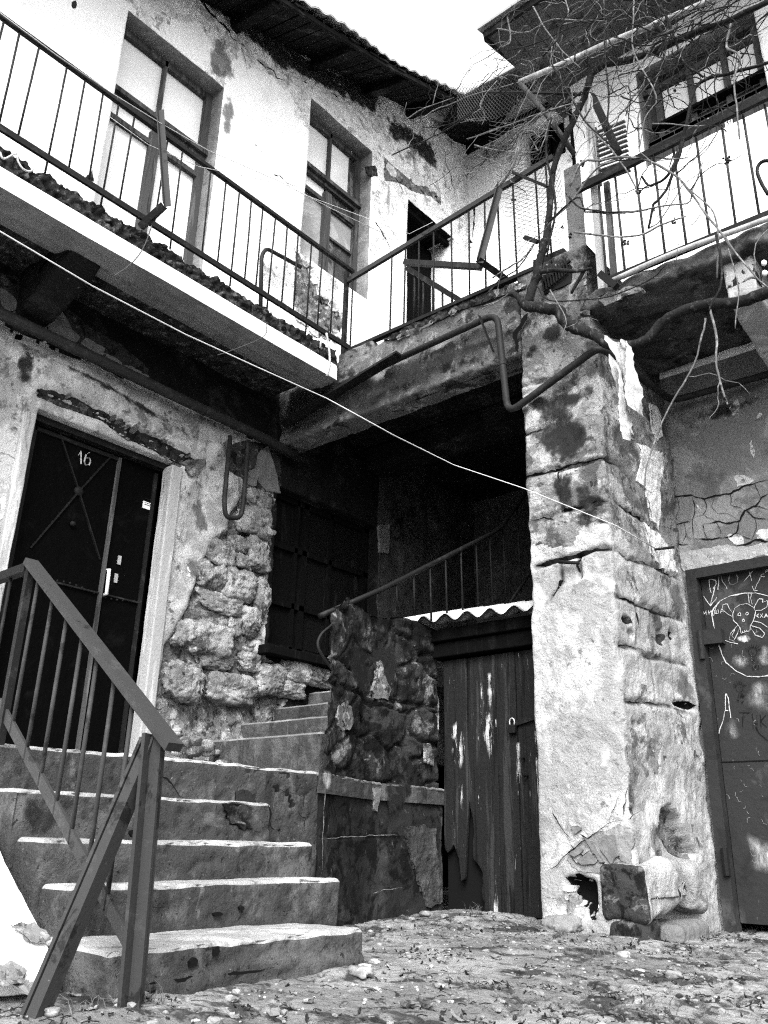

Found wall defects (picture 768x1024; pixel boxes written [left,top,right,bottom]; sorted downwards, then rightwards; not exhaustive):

damp [211,39,233,76]
damp [223,102,234,132]
peeling [365,157,441,205]
spalling [36,389,206,477]
damp [531,386,592,462]
damp [554,475,603,526]
crack [674,480,768,559]
spalling [222,803,254,829]
crack [549,786,645,870]
spalling [563,873,599,920]